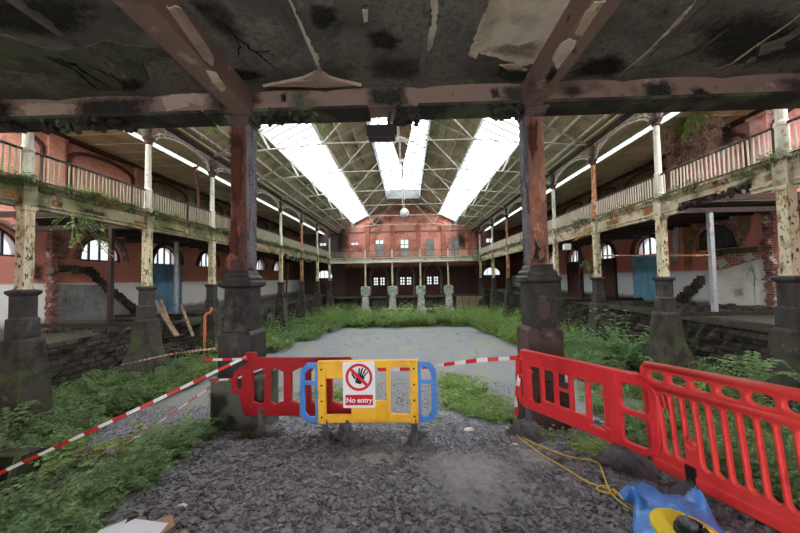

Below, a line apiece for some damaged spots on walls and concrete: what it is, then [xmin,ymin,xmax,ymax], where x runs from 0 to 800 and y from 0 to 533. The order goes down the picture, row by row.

peeling [166,5,226,92]
crack [224,25,278,70]
leakage [311,5,337,29]
leakage [368,31,400,49]
peeling [468,0,570,71]
leakage [564,55,631,97]
rust [528,120,538,159]
rust [230,133,243,207]
rust [529,240,546,263]
spalling [716,196,799,311]
spalling [44,232,61,330]